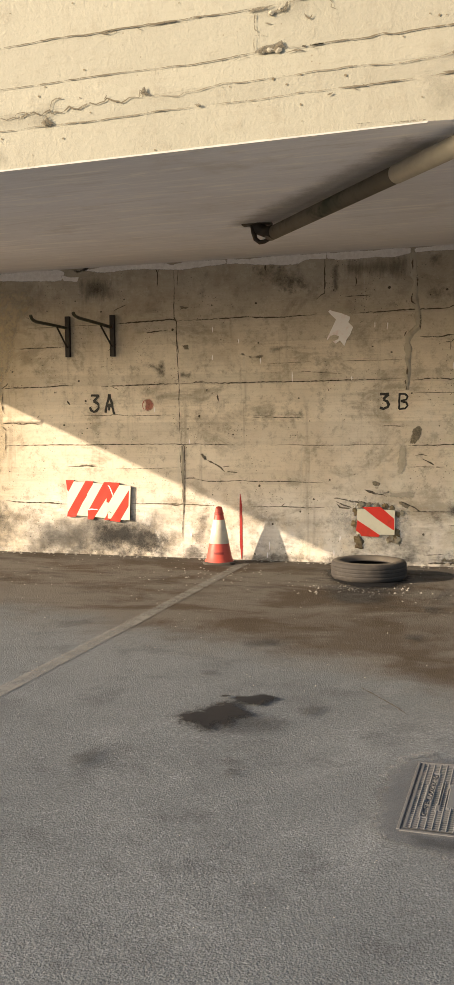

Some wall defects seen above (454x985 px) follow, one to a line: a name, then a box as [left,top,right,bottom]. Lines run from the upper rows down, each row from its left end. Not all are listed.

crack [0,8,454,132]